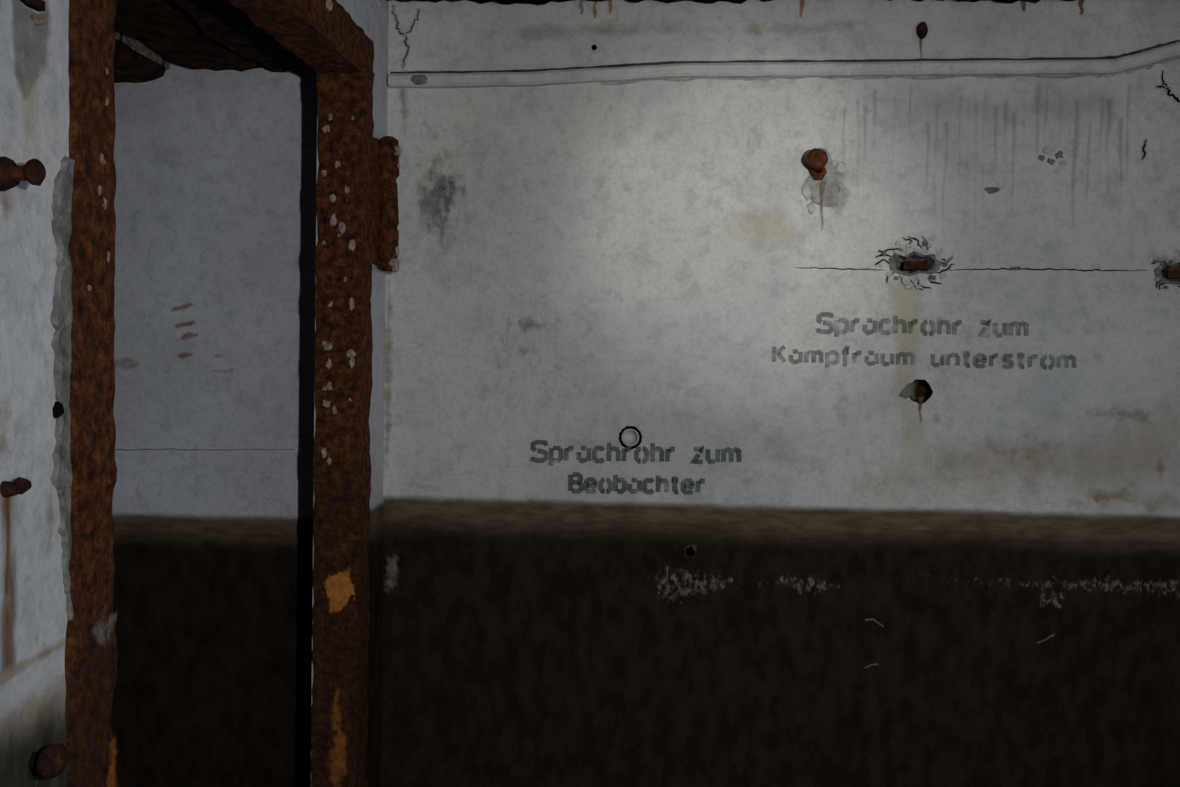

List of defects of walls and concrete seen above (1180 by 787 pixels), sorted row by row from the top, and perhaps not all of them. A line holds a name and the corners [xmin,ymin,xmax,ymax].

crack [390,5,1180,104]
hole [874,236,954,291]
hole [1151,259,1180,293]
rust [172,304,197,339]
spalling [899,379,933,404]
rust [3,497,14,671]
rust [324,569,355,612]
rust [106,739,116,787]
rust [330,691,347,787]